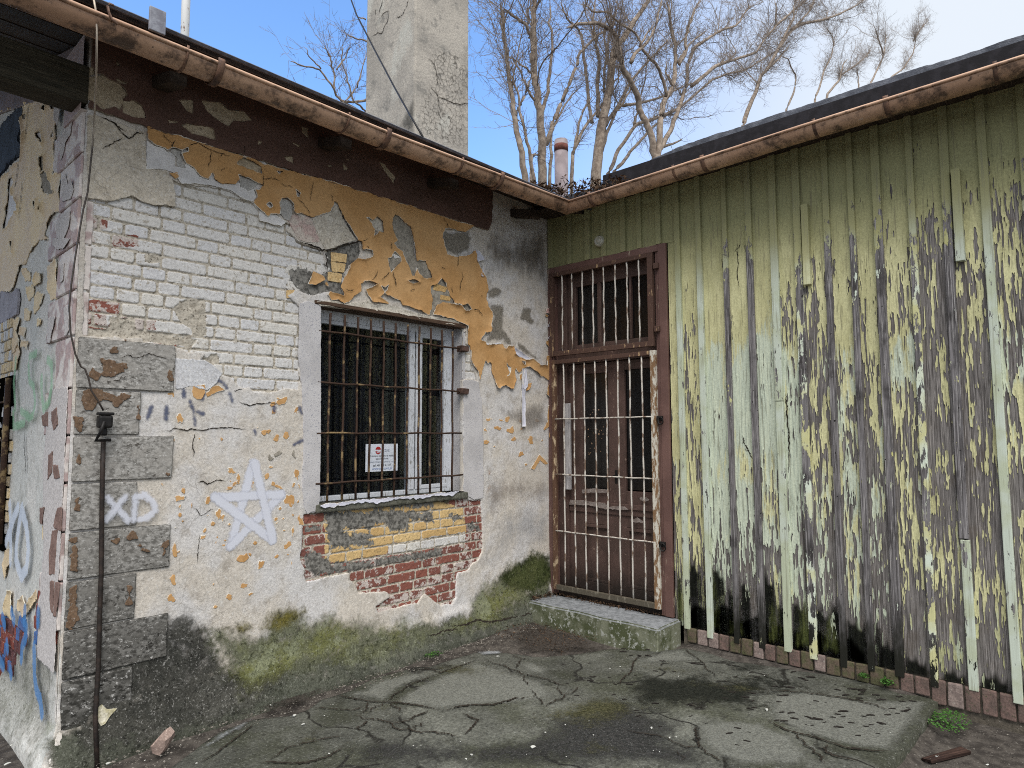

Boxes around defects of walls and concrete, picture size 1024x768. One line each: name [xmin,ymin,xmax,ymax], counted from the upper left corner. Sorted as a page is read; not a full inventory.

crack [423,50,468,147]
flaking render [0,67,550,676]
peeling [668,86,1024,689]
crack [428,613,532,636]
leakage [678,564,928,677]
leakage [0,585,551,768]
crack [258,655,578,764]
crack [630,724,732,763]
crack [769,720,888,765]
crack [776,690,897,713]
leakage [944,671,966,685]
leakage [981,676,1024,697]